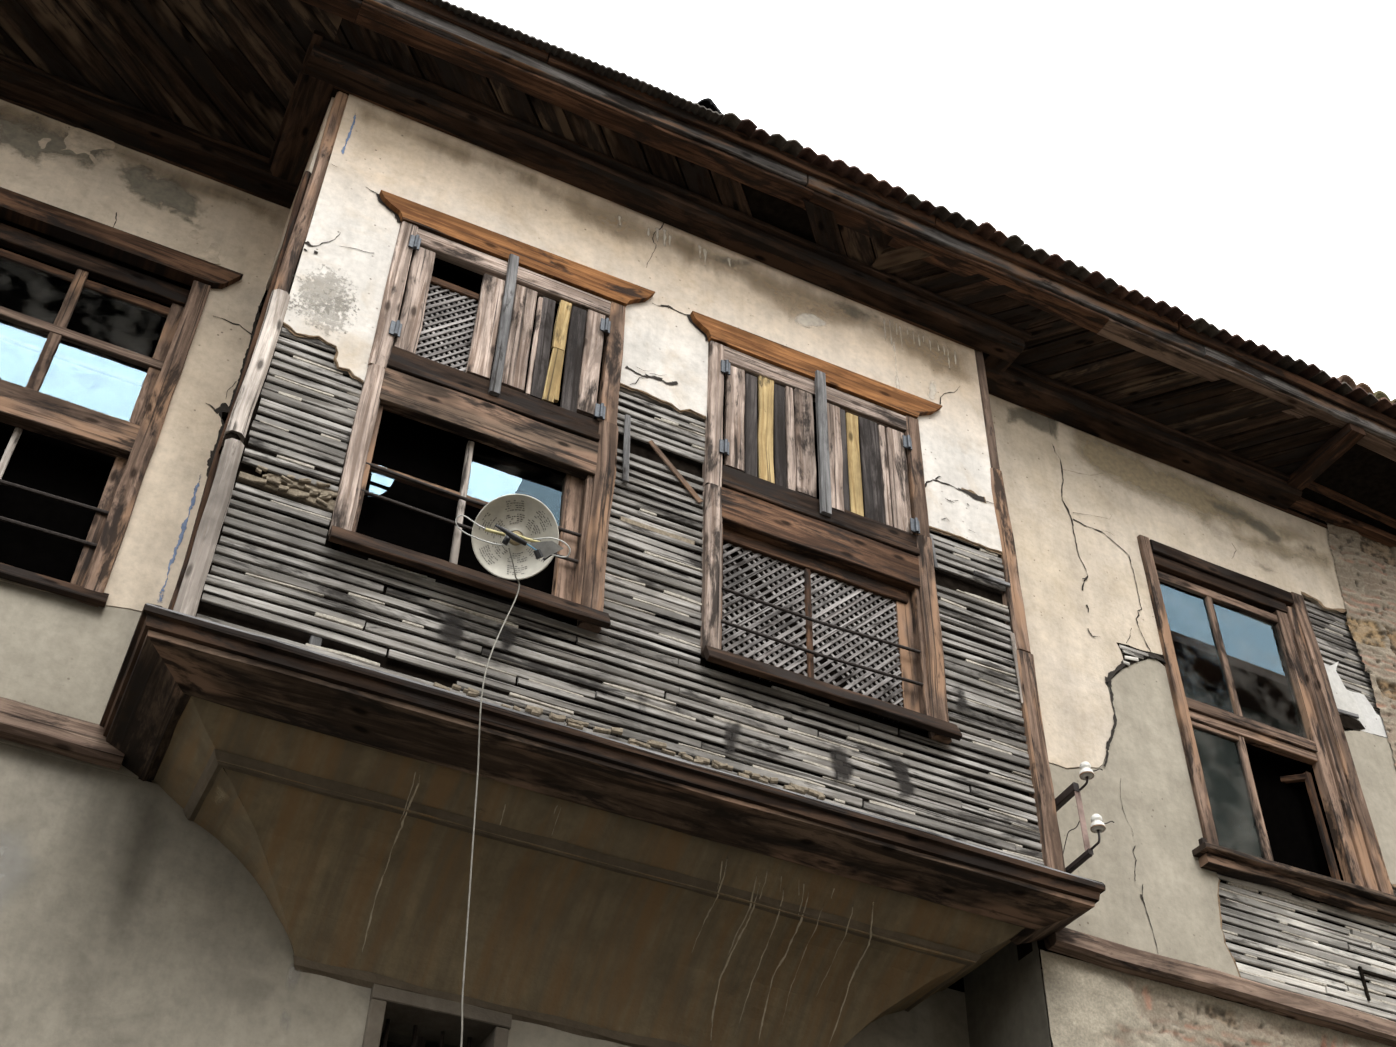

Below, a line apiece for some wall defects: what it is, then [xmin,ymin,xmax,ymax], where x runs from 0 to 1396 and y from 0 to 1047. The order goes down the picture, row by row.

damp [0,107,105,166]
damp [122,165,224,216]
crack [368,188,401,223]
crack [304,234,370,254]
crack [625,366,678,385]
crack [925,476,994,533]
flaking render [196,322,1044,866]
flaking render [1115,642,1165,674]
crack [1053,446,1166,951]